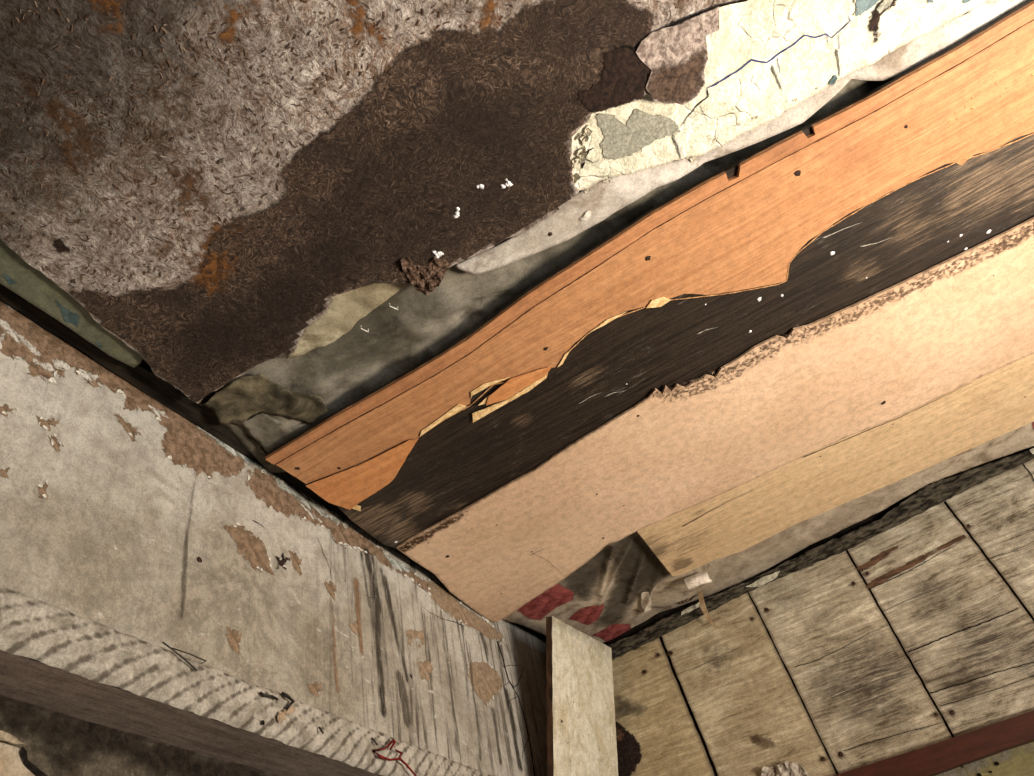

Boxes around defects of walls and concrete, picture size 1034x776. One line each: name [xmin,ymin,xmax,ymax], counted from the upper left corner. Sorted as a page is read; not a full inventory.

crack [660,0,748,30]
peeling [570,0,987,193]
water stain [70,0,655,402]
peeling [0,299,505,643]
peeling [226,627,242,654]
peeling [406,629,433,681]